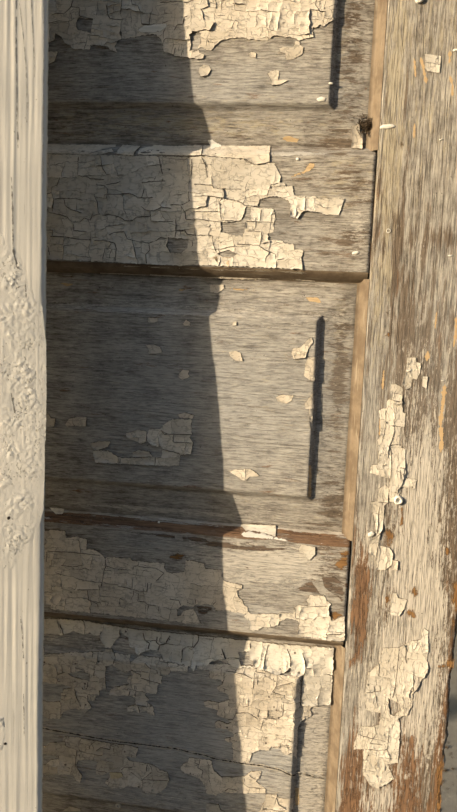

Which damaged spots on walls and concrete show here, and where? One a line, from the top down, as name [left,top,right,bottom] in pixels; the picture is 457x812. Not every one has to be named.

peeling [48,0,338,77]
peeling [267,70,288,85]
peeling [46,144,344,293]
peeling [291,338,317,382]
peeling [43,357,428,812]